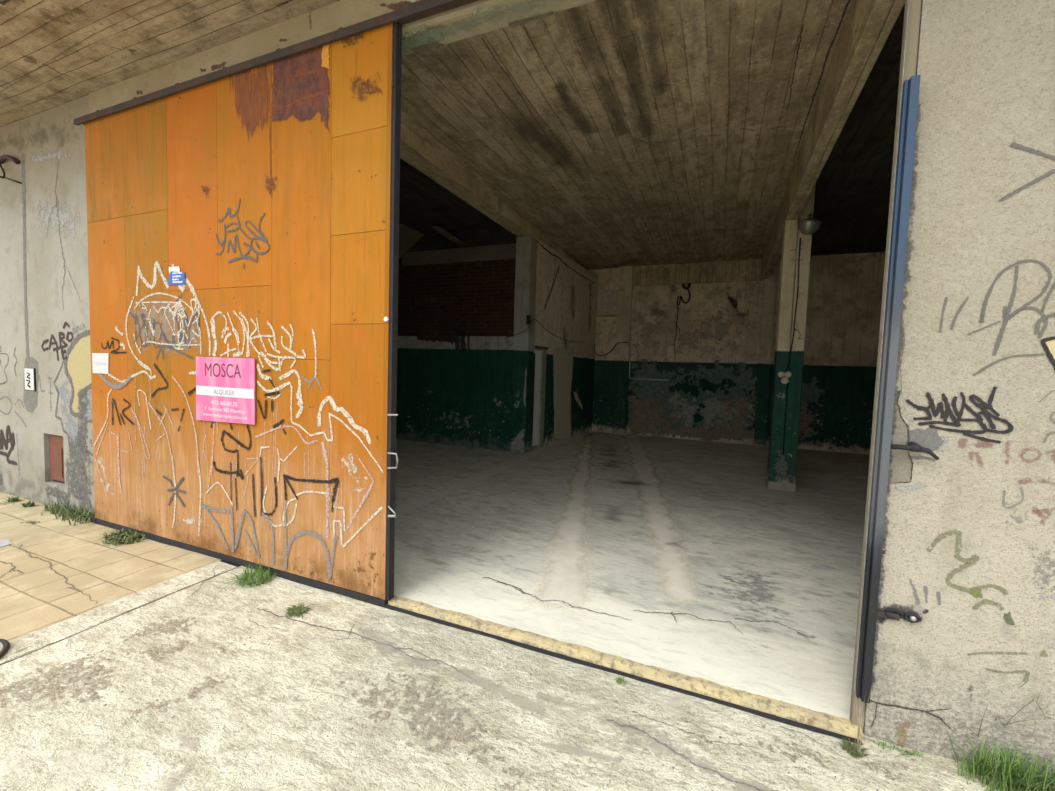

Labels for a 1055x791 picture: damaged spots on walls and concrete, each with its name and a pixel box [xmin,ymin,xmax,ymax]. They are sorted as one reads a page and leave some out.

rust [351,30,393,105]
damp [556,85,591,133]
damp [602,0,650,136]
peeling [626,281,763,441]
spalling [888,299,949,494]
crack [0,544,245,627]
crack [483,577,809,640]
crack [870,700,953,731]